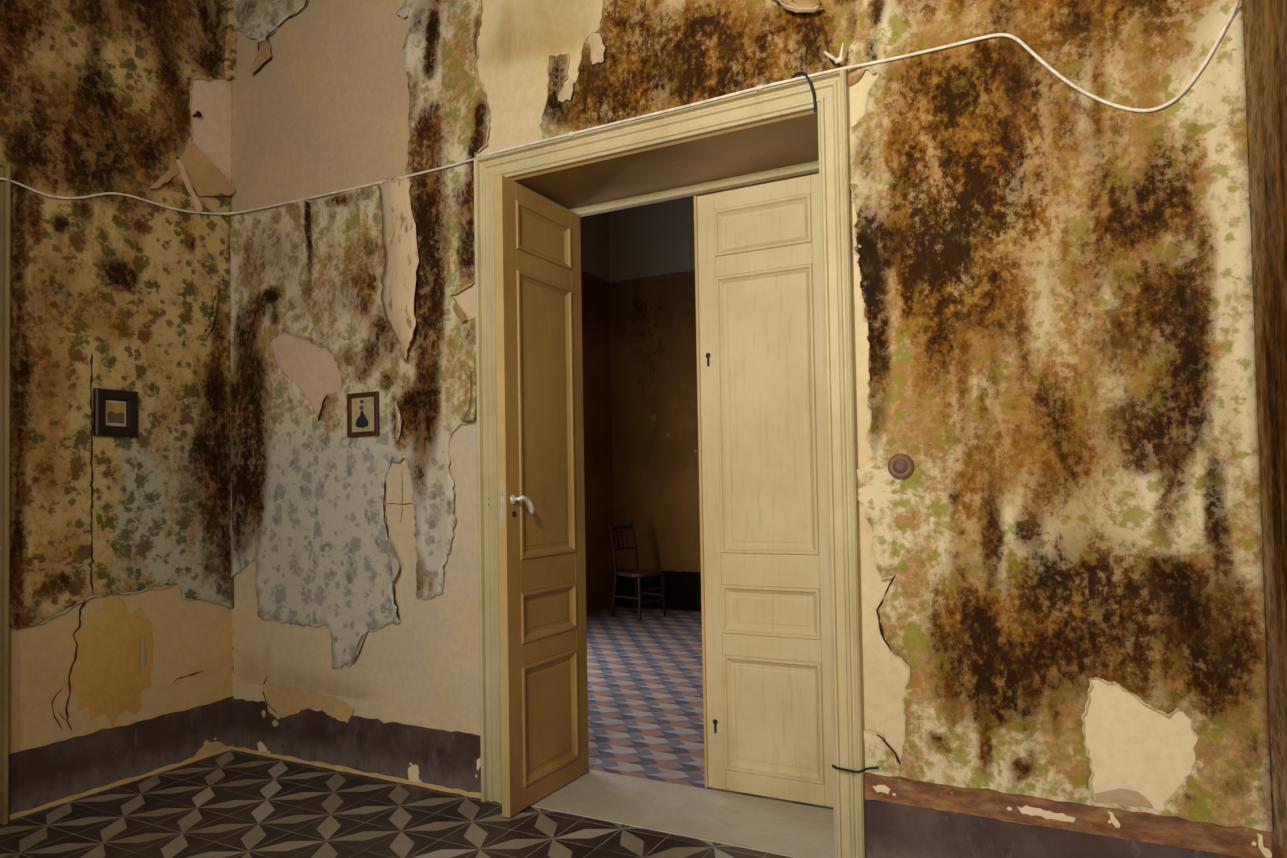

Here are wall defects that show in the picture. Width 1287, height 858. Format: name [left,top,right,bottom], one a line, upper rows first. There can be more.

water stain [0,0,225,626]
water stain [182,286,282,587]
peeling [9,371,480,754]
peeling [149,0,419,362]
peeling [269,333,342,419]
water stain [340,98,487,494]
water stain [414,0,442,87]
peeling [475,0,605,157]
water stain [542,0,1287,772]
peeling [1007,805,1075,822]
peeling [1081,677,1199,828]
spalling [1251,834,1272,858]